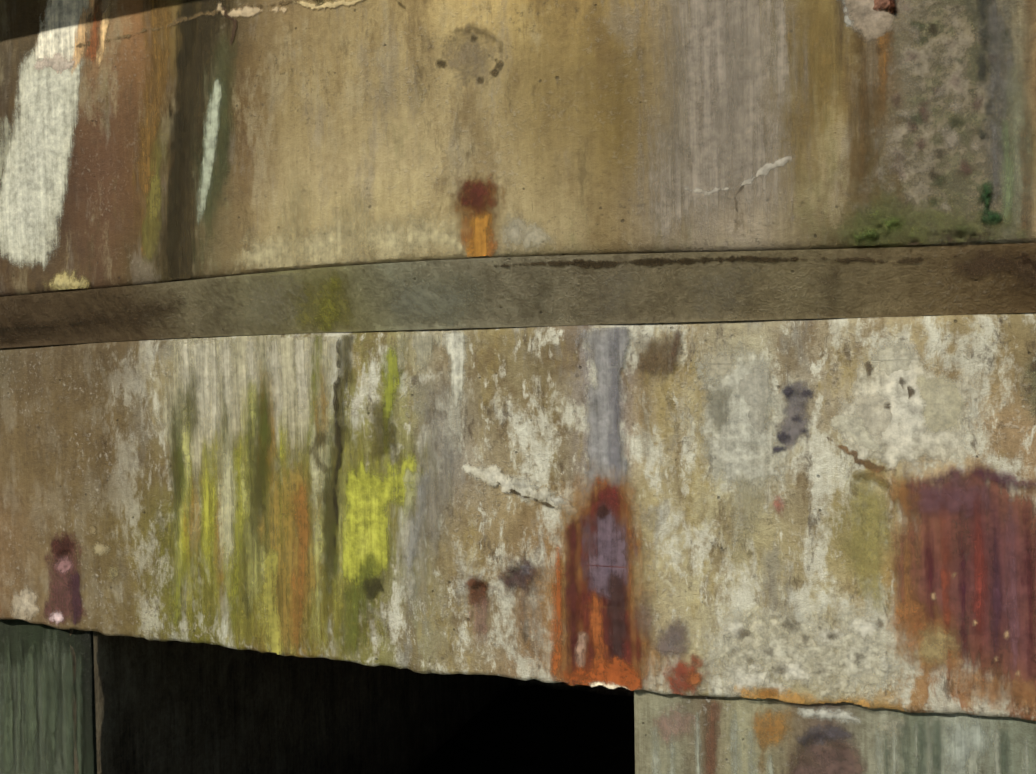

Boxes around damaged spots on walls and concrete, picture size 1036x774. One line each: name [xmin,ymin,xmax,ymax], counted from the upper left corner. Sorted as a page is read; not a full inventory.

crack [76,0,361,48]
leakage [842,0,901,92]
leakage [0,0,111,267]
leakage [133,0,230,280]
rust [458,180,496,257]
crack [685,156,795,210]
leakage [49,271,89,290]
leakage [163,334,351,555]
leakage [372,404,394,455]
rust [44,533,84,624]
rust [466,478,701,695]
rust [893,467,1036,707]